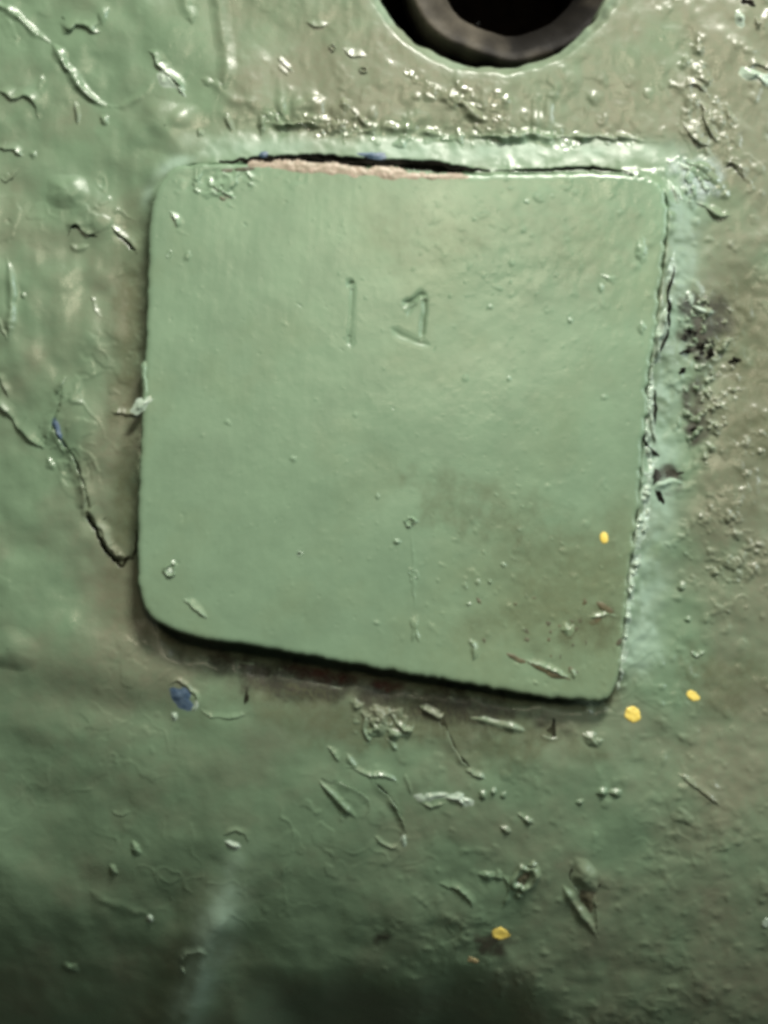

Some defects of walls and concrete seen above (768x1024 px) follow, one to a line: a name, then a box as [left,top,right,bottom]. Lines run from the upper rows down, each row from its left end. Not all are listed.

spalling [306,17,329,28]
spalling [328,43,368,74]
spalling [738,54,768,87]
spalling [293,93,330,112]
spalling [189,151,469,201]
spalling [169,210,184,228]
crack [86,502,138,568]
peeling [581,731,604,749]
peeling [318,745,507,849]
peeling [574,787,623,807]
spalling [507,860,542,900]
peeling [562,857,601,939]